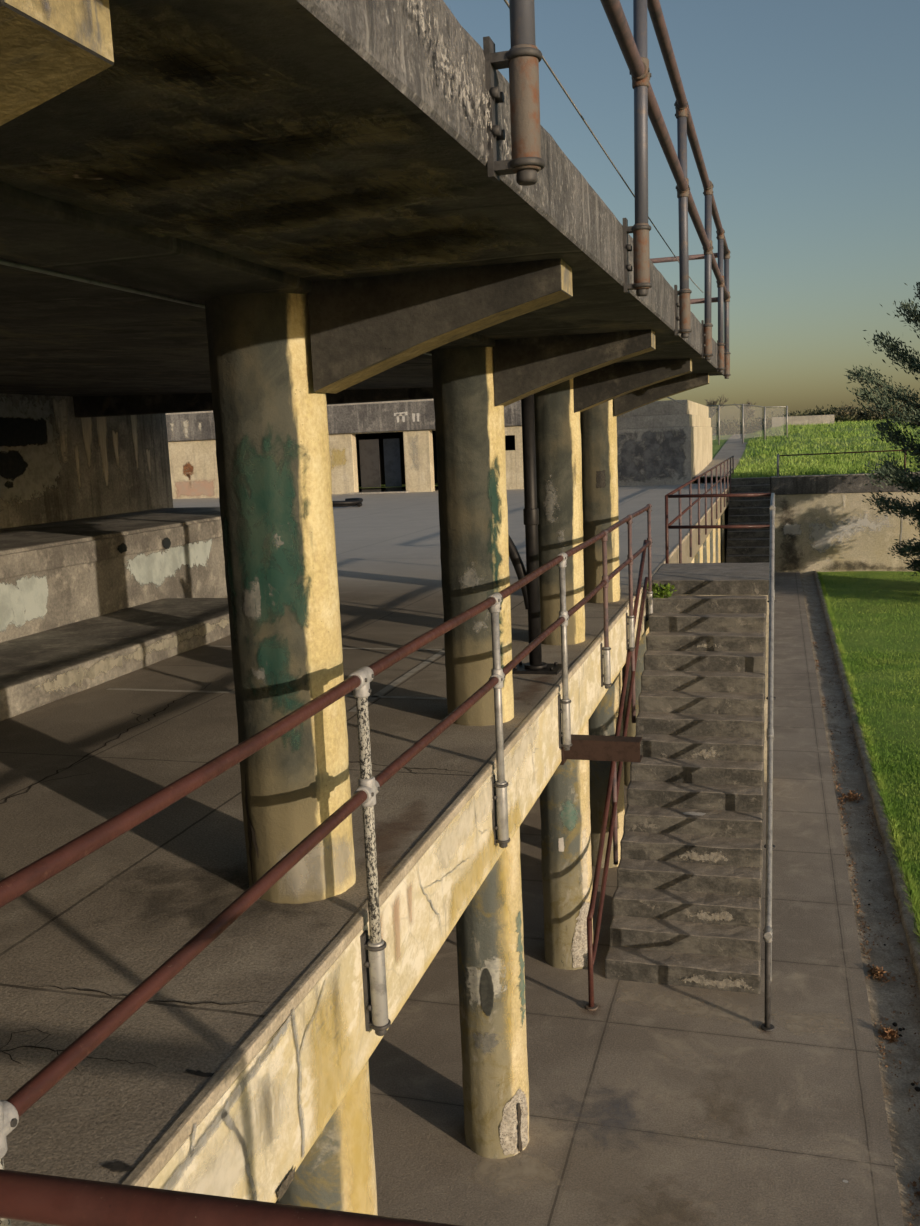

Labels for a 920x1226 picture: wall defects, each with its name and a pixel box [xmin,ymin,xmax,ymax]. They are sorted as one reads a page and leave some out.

leakage [18,111,505,276]
peeling [0,575,48,632]
peeling [34,436,311,713]
spalling [558,800,590,968]
crack [0,1029,156,1071]
crack [34,984,325,1201]
peeling [465,911,526,1025]
spalling [499,1087,528,1155]